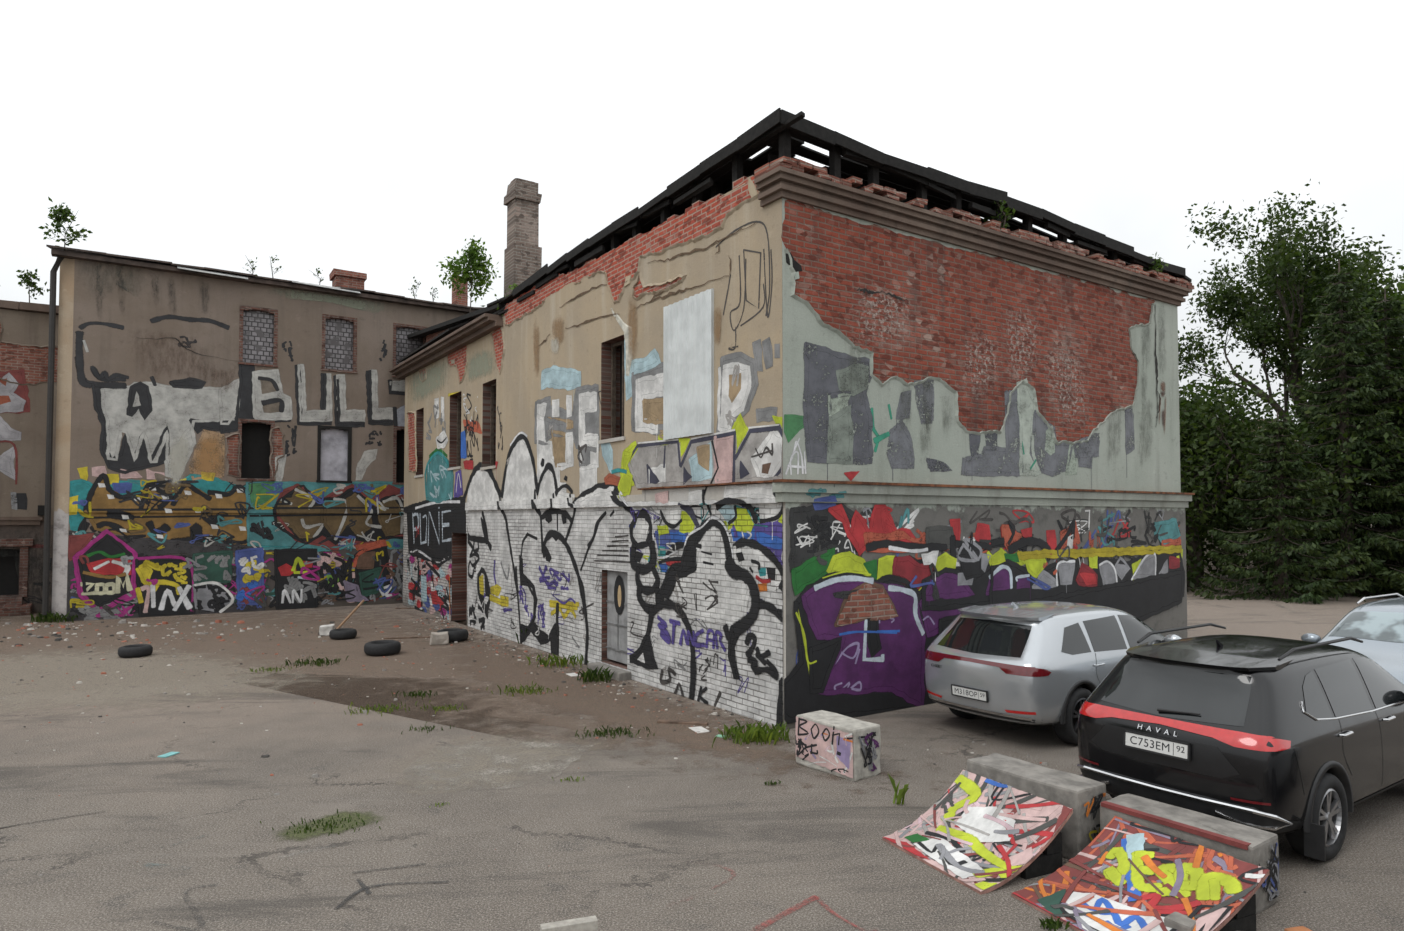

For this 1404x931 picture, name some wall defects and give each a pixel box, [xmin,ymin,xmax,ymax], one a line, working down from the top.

flaking render [0,320,58,386]
flaking render [490,177,760,375]
flaking render [781,200,1155,445]